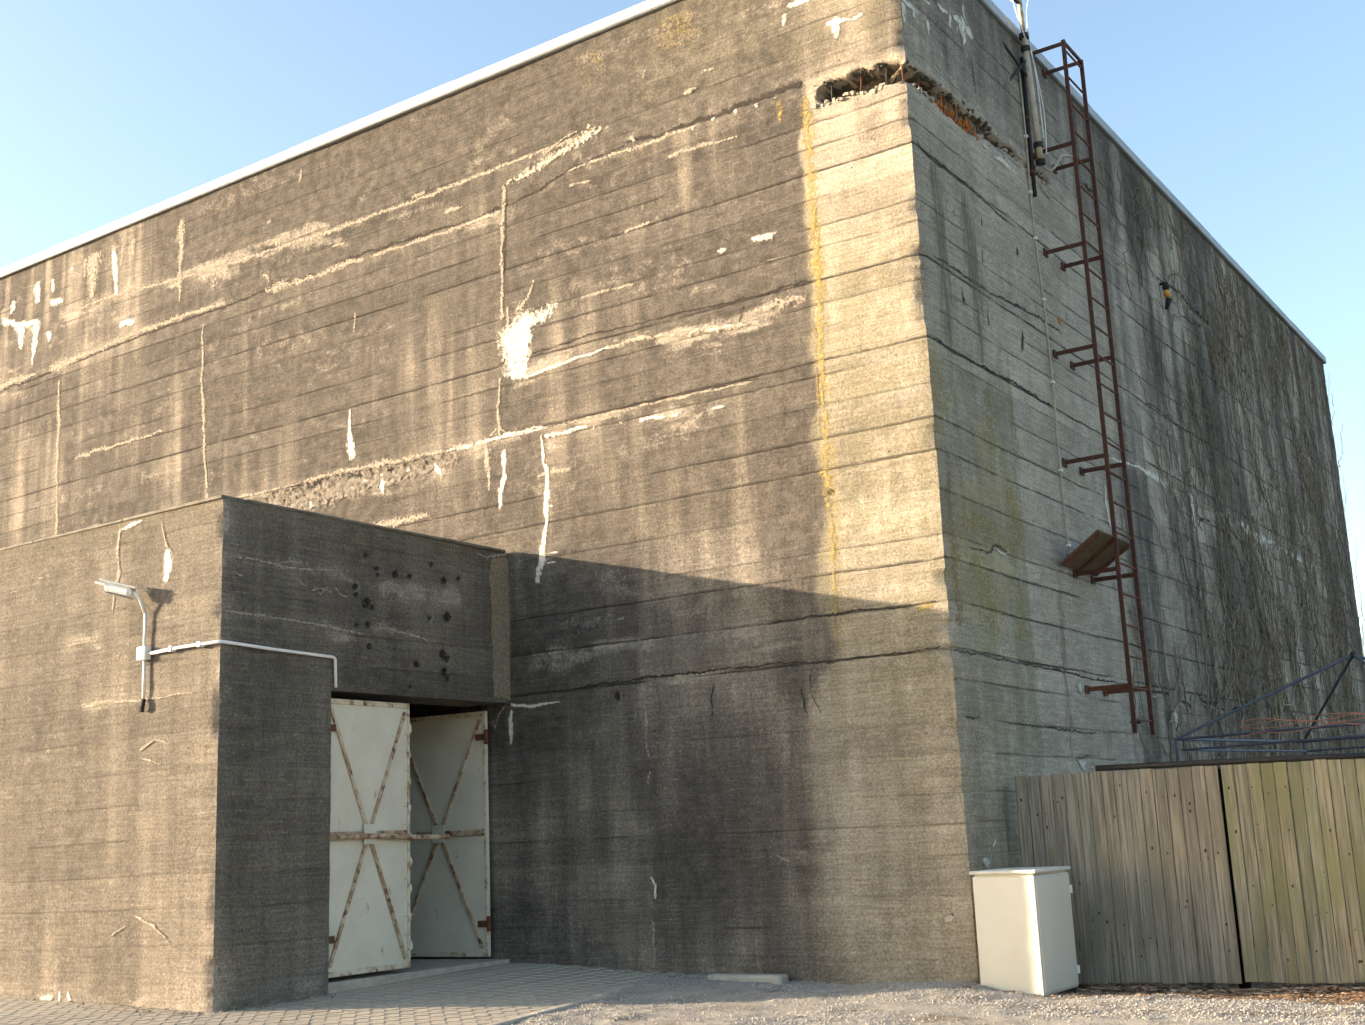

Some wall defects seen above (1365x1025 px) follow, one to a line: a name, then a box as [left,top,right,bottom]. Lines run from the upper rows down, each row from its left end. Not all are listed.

spalling [812,56,1050,198]
efflorescence [2,302,51,365]
efflorescence [33,279,63,306]
efflorescence [70,239,136,298]
water stain [346,410,355,460]
efflorescence [535,436,571,583]
water stain [801,95,840,649]
water stain [1171,332,1230,649]